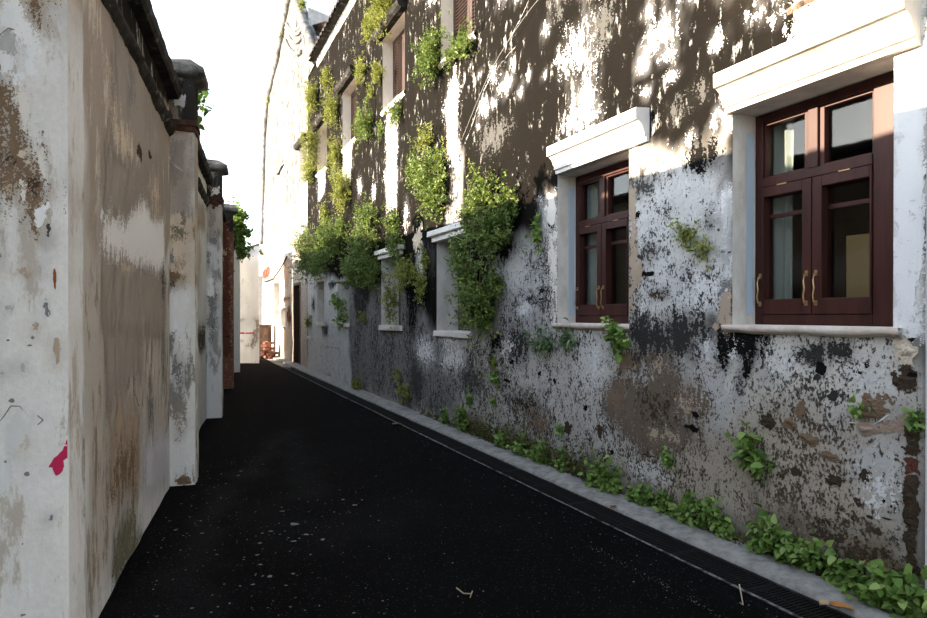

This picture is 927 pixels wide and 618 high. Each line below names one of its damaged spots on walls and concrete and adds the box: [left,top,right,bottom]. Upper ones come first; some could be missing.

leakage [584,0,622,55]
peeling [744,0,793,32]
mould [663,74,711,128]
leakage [0,70,66,241]
leakage [476,113,516,165]
leakage [98,17,226,592]
leakage [597,258,770,470]
peeling [692,333,752,440]
peeling [760,343,797,376]
leakage [791,337,854,368]
spalling [758,401,840,462]
spalling [824,337,921,576]